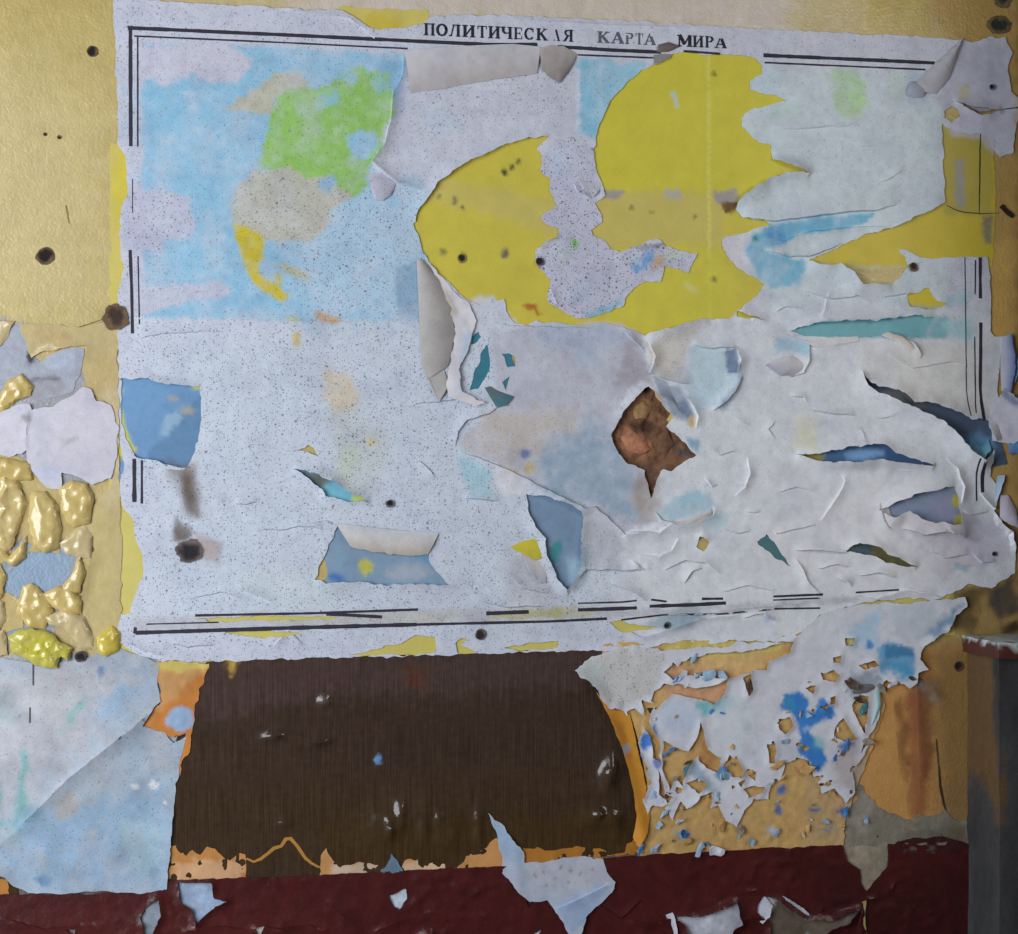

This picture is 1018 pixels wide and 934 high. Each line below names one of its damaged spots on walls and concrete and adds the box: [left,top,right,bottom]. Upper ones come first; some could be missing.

flaking render [0,322,84,400]
spalling [611,386,696,495]
peeling [575,597,969,891]
peeling [140,898,161,934]
peeling [178,883,225,926]
peeling [389,889,407,909]
peeling [675,902,743,934]
peeling [760,896,859,934]